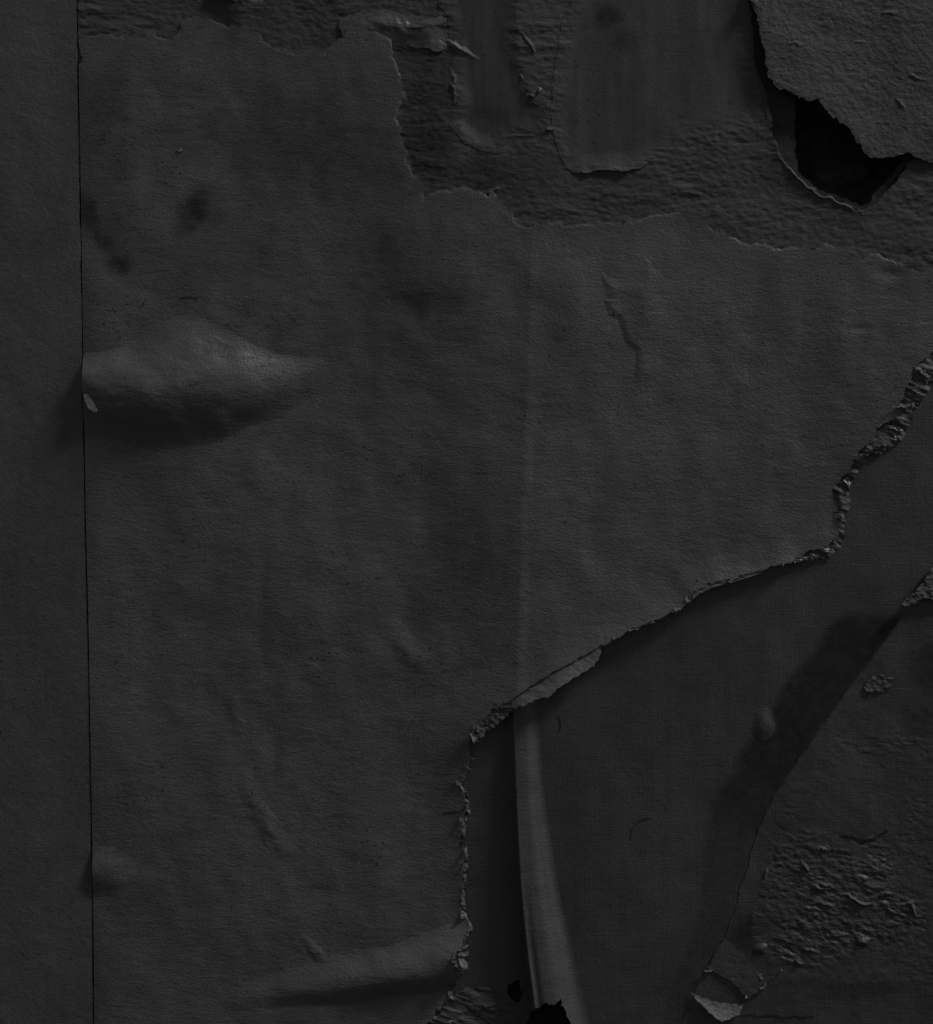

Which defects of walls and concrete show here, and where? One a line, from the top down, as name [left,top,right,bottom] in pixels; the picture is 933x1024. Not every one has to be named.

peeling [338,9,480,61]
peeling [902,566,933,607]
peeling [470,702,515,742]
peeling [691,716,933,1022]